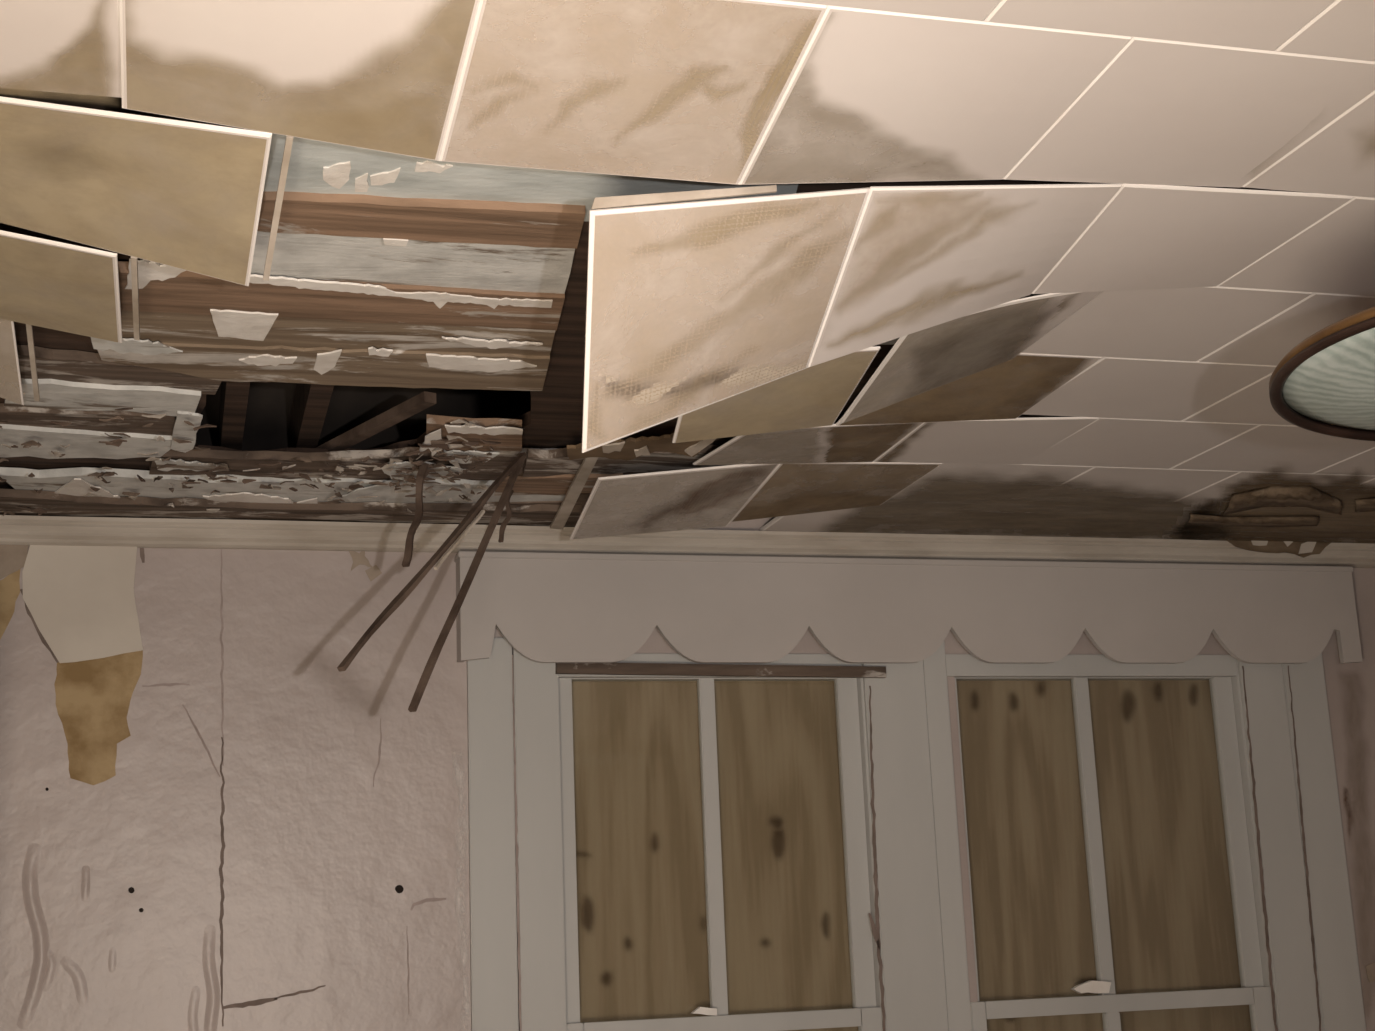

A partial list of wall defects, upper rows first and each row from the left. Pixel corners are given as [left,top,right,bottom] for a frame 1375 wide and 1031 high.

water stain [0,0,568,342]
flaking render [125,259,186,289]
peeling [249,274,553,309]
water stain [579,21,1375,544]
flaking render [210,309,297,367]
peeling [314,349,342,375]
peeling [426,336,543,372]
flaking render [155,411,229,472]
peeling [342,424,523,502]
spalling [567,433,717,460]
flaking render [54,650,143,785]
crack [142,549,326,1026]